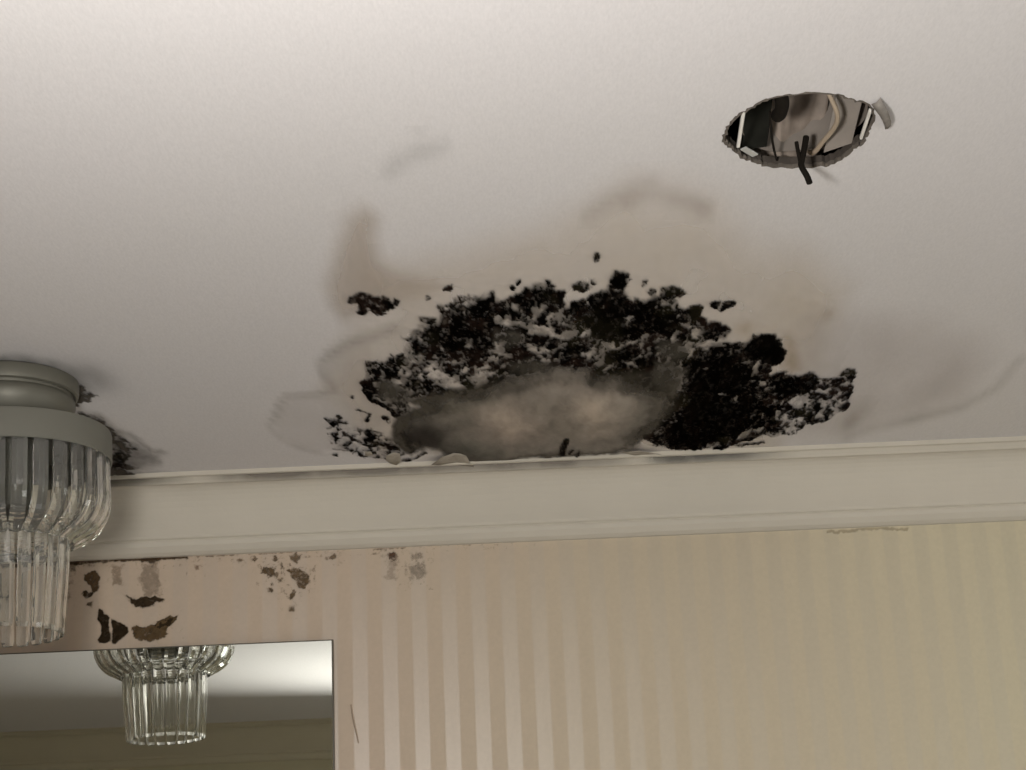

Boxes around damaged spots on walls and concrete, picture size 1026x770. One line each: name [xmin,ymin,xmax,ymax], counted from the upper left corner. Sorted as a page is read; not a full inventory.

leakage [75,385,148,476]
leakage [324,270,857,462]